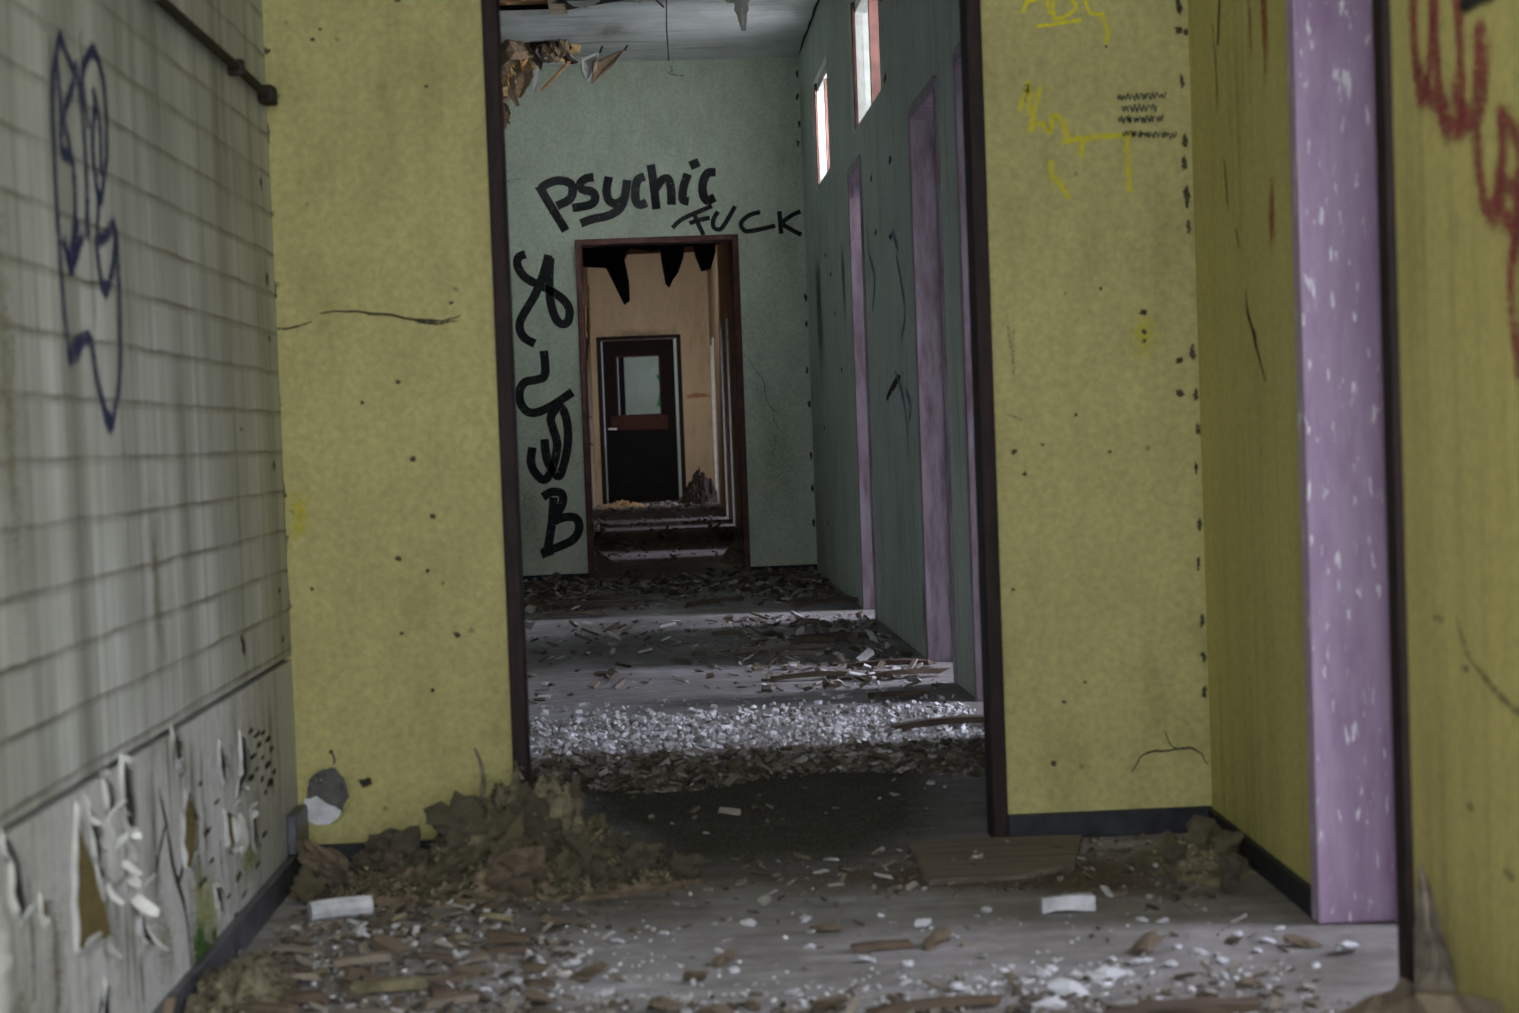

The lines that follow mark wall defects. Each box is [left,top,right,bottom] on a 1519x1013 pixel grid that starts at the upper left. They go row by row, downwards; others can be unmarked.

peeling [581,45,628,85]
crack [277,310,461,330]
crack [1456,616,1519,715]
peeling [0,830,53,929]
peeling [71,753,138,959]
peeling [170,725,276,922]
spalling [301,749,375,825]
crack [1131,731,1208,773]
peeling [136,914,155,952]
peeling [99,976,114,1013]